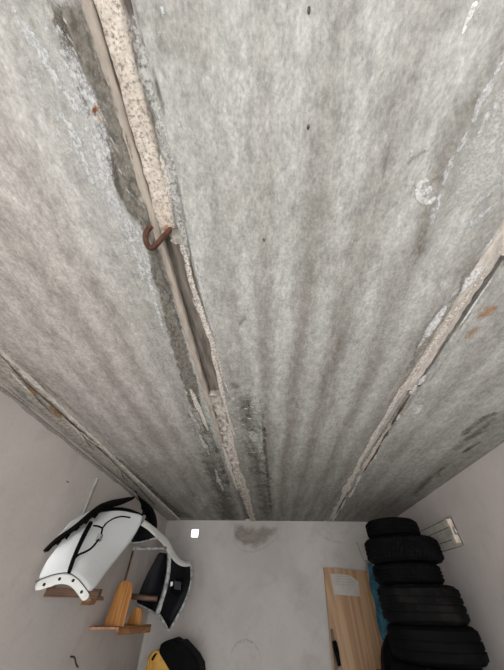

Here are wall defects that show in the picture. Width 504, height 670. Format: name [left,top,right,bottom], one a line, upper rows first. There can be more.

crack [1,356,155,505]
leakage [12,3,236,519]
peeling [169,224,260,513]
leakage [241,400,272,517]
spalling [329,247,504,521]